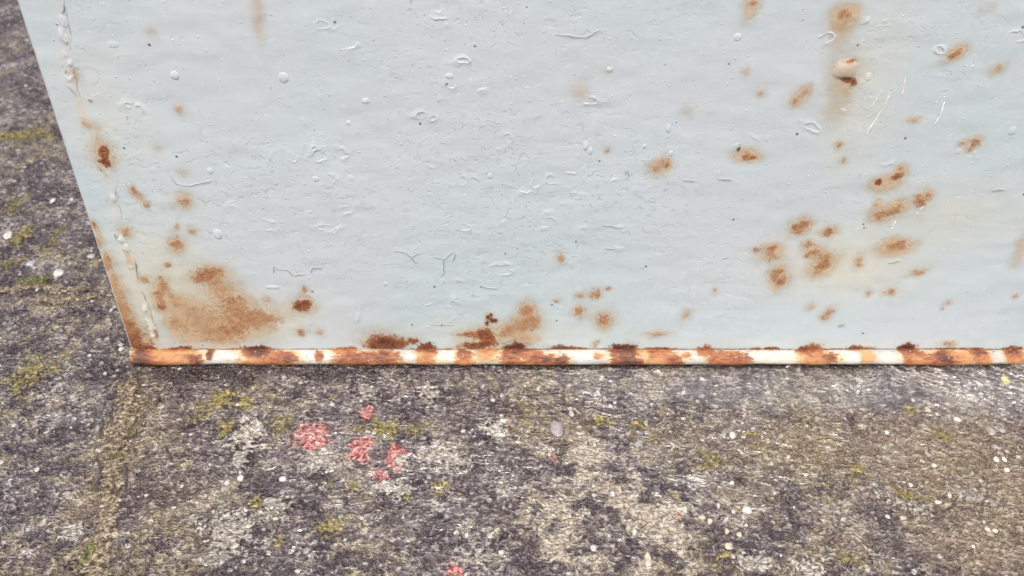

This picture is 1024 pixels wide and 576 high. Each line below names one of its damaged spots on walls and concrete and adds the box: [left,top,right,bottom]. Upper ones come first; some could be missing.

corrosion [831,4,859,30]
corrosion [947,46,966,59]
corrosion [96,140,112,168]
corrosion [652,160,671,173]
corrosion [736,147,758,162]
corrosion [870,165,932,222]
corrosion [878,237,912,256]
corrosion [91,218,875,366]
corrosion [887,342,1024,366]